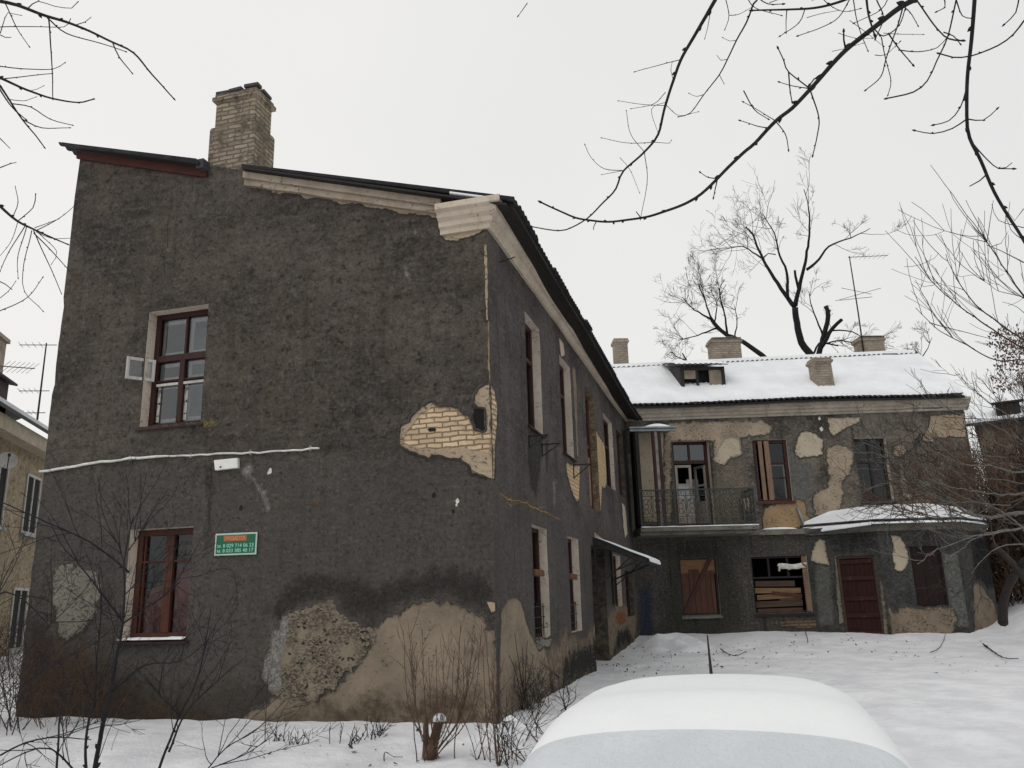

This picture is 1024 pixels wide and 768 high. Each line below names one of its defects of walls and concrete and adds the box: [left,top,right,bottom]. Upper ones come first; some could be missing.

flaking render [397,383,499,480]
spalling [638,420,773,523]
spalling [739,417,861,530]
spalling [922,414,967,442]
flaking render [49,560,104,644]
water stain [264,570,492,691]
spalling [244,595,552,724]
spalling [810,538,844,626]
spalling [889,534,910,572]
spalling [878,578,958,635]